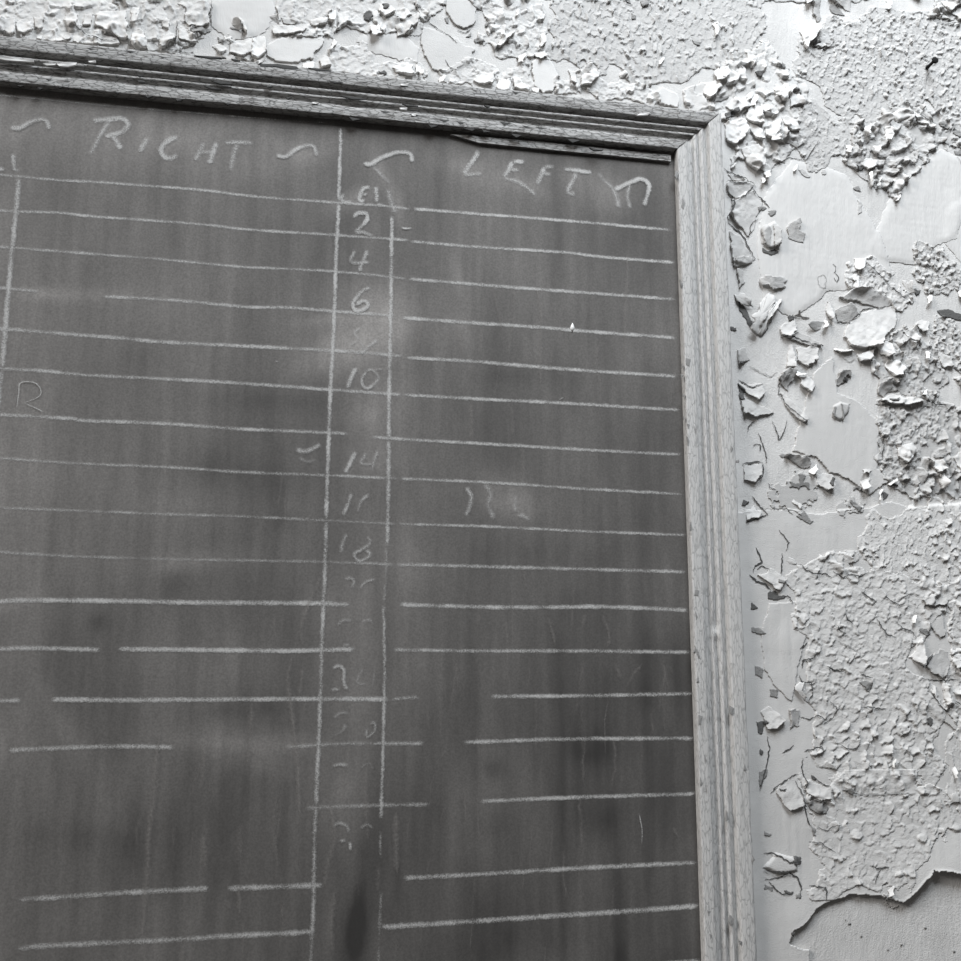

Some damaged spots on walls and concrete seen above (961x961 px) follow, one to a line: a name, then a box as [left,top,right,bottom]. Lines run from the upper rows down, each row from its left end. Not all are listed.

peeling [0,0,961,336]
peeling [731,446,763,483]
peeling [737,241,961,961]